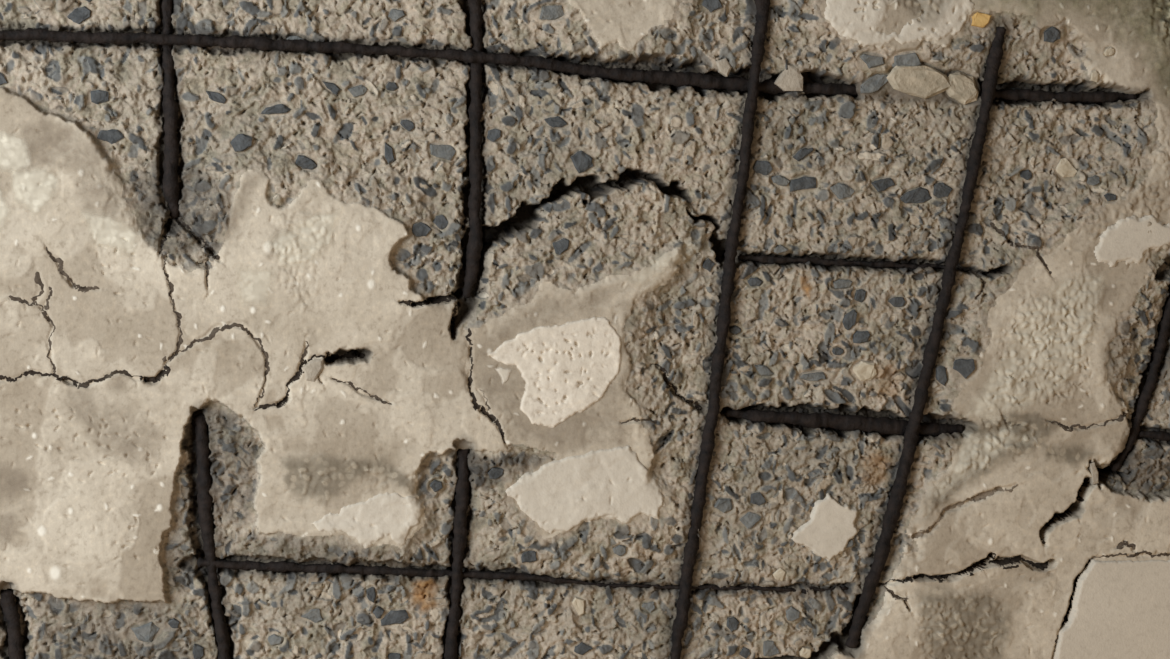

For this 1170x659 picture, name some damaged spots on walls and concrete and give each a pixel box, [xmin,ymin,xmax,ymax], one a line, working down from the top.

crack [0,212,392,411]
spalling [0,0,749,659]
crack [399,291,506,444]
spalling [468,0,1170,659]
crack [1049,410,1129,432]
crack [880,477,1089,610]
crack [1055,541,1170,646]